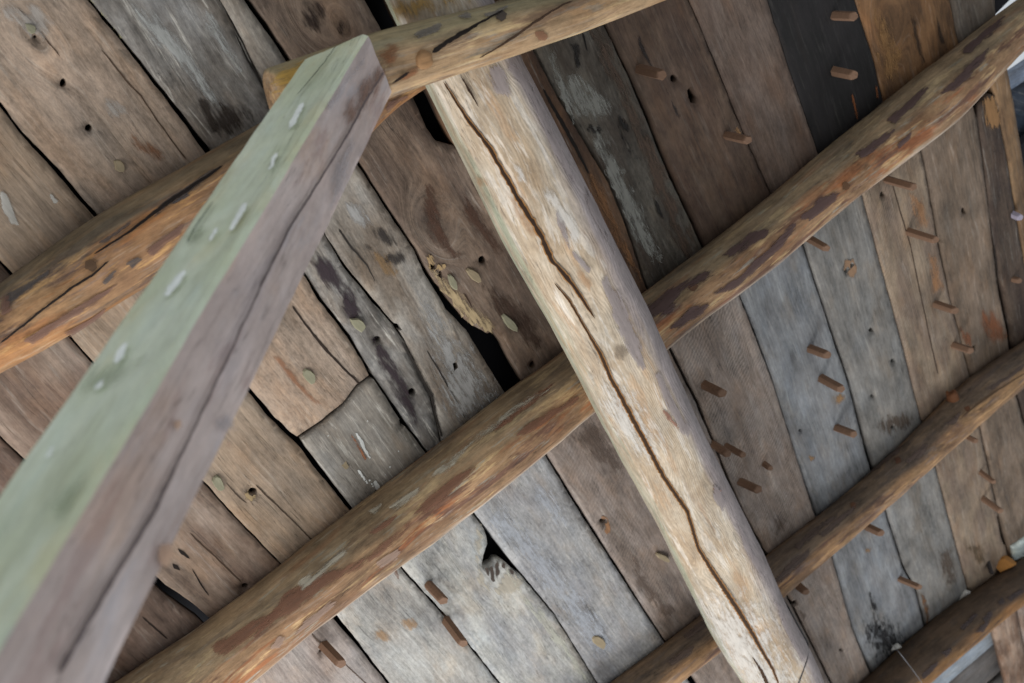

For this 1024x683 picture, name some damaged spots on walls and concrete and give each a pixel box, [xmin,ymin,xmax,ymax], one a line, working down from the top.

crack [444,77,779,683]